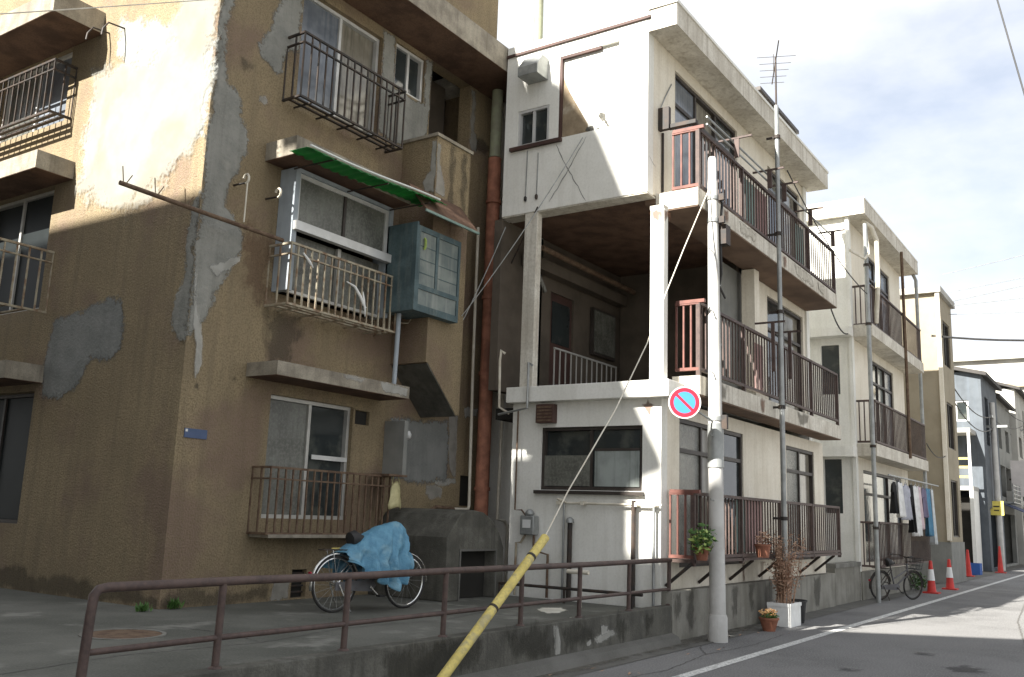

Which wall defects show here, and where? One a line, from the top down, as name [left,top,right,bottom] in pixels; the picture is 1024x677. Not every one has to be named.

peeling [77,0,220,208]
damp [423,141,445,196]
peeling [210,257,240,276]